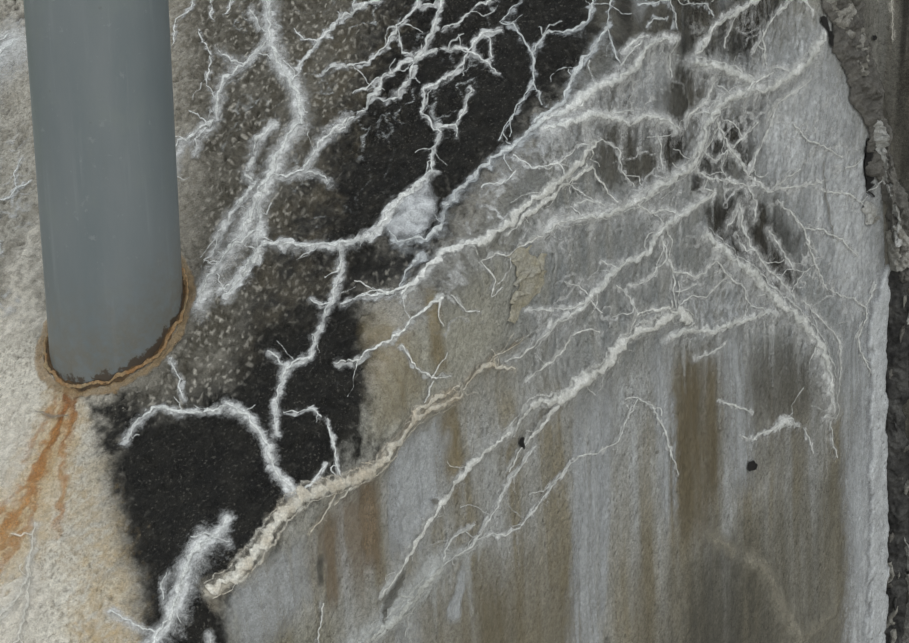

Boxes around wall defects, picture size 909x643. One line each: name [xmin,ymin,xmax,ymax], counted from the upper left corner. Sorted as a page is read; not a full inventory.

crack [820,16,834,46]
leakage [901,0,909,58]
leakage [594,0,766,214]
crack [823,160,834,239]
crack [864,138,875,197]
leakage [692,195,797,336]
corrosion [0,387,79,543]